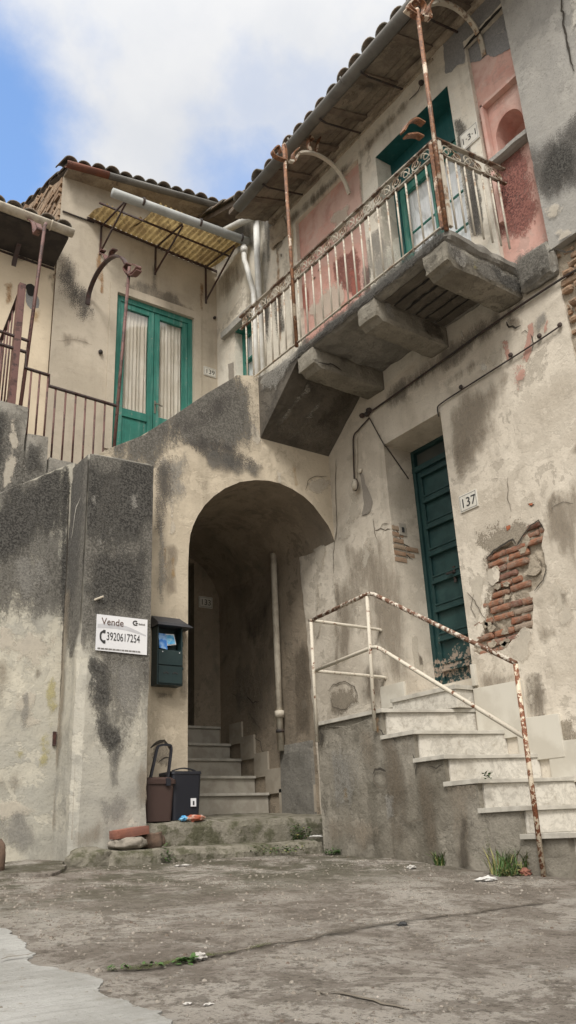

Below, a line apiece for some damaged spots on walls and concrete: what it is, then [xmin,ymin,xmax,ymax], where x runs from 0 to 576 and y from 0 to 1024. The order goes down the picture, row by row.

leakage [455,114,576,238]
leakage [0,221,550,781]
flaking render [392,524,419,563]
flaking render [469,503,547,654]
leakage [561,718,576,741]